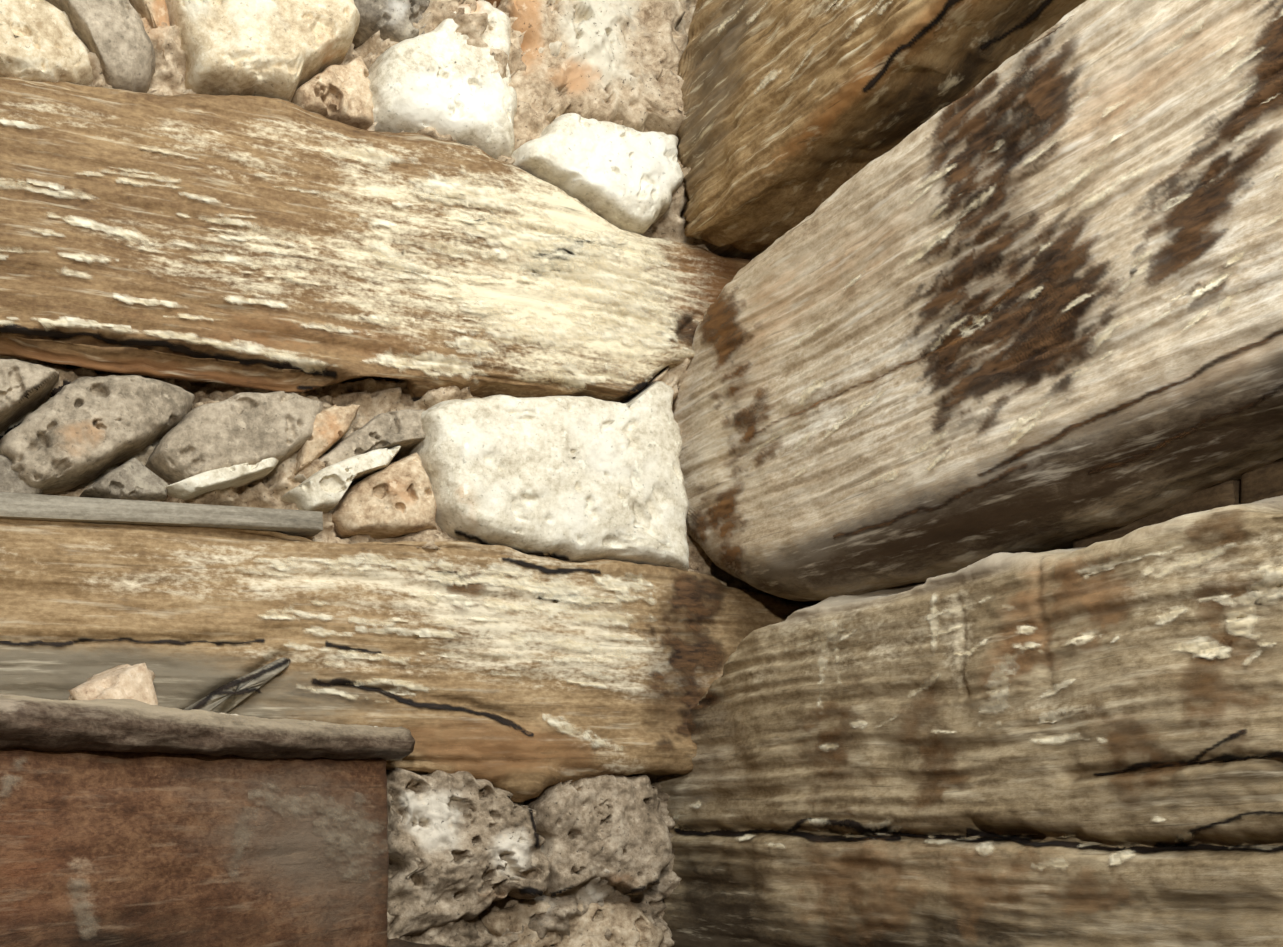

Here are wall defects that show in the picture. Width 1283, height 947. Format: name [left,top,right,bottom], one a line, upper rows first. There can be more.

crack [863,0,960,92]
crack [980,0,1053,50]
crack [833,329,1283,539]
crack [455,531,601,574]
crack [0,637,534,737]
crack [1094,729,1283,776]
crack [674,811,1283,853]